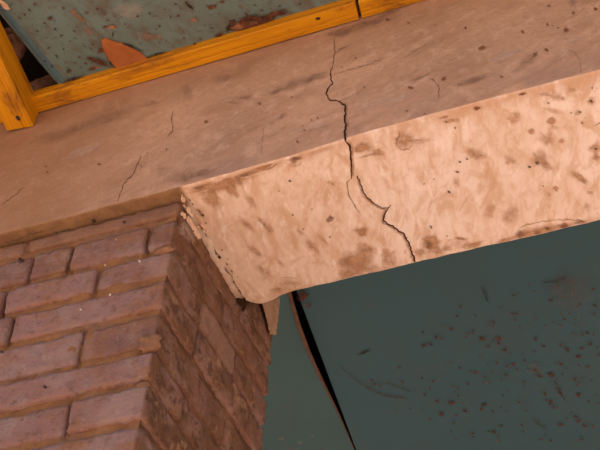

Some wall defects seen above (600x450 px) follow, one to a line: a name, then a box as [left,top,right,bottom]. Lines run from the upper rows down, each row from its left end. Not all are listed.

rust [204,5,287,37]
crack [326,43,415,262]
peeling [180,195,207,239]